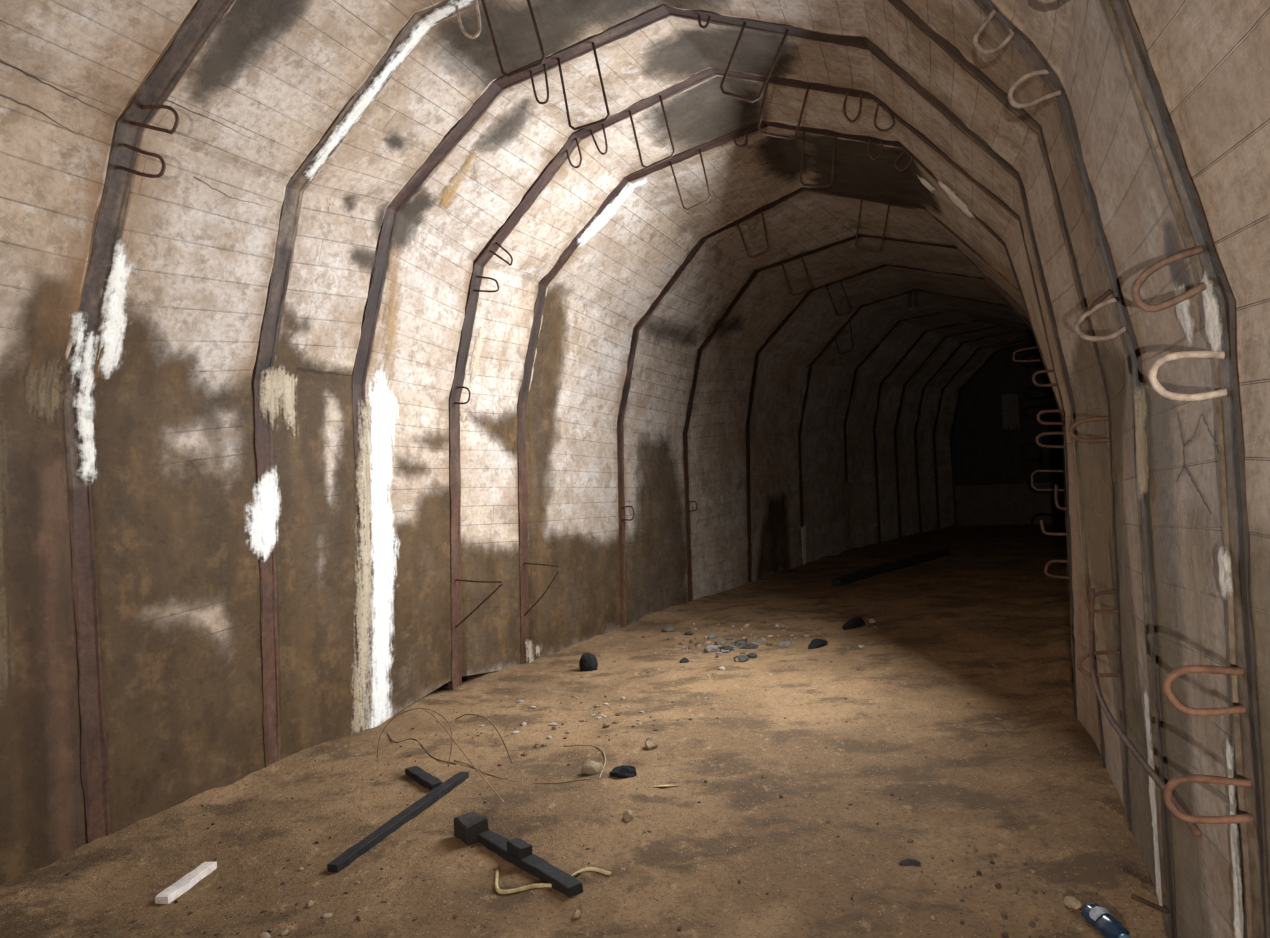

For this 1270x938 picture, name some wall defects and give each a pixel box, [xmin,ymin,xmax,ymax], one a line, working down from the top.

leakage [307,0,721,179]
leakage [645,30,794,149]
leakage [757,133,975,218]
leakage [1175,276,1220,354]
leakage [0,102,692,885]
leakage [1069,331,1245,938]
leakage [1248,550,1270,914]